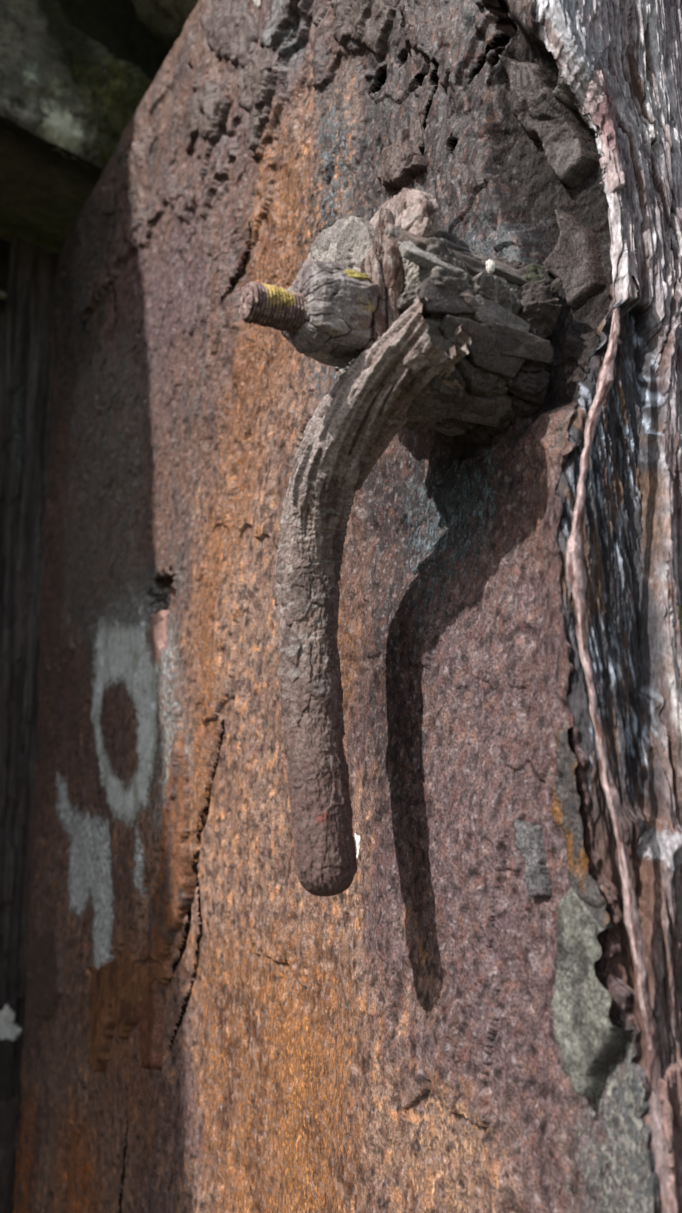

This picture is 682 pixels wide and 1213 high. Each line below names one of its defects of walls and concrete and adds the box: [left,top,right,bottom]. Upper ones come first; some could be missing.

rust [247,140,311,289]
rust [88,323,297,1073]
crack [169,719,225,1049]